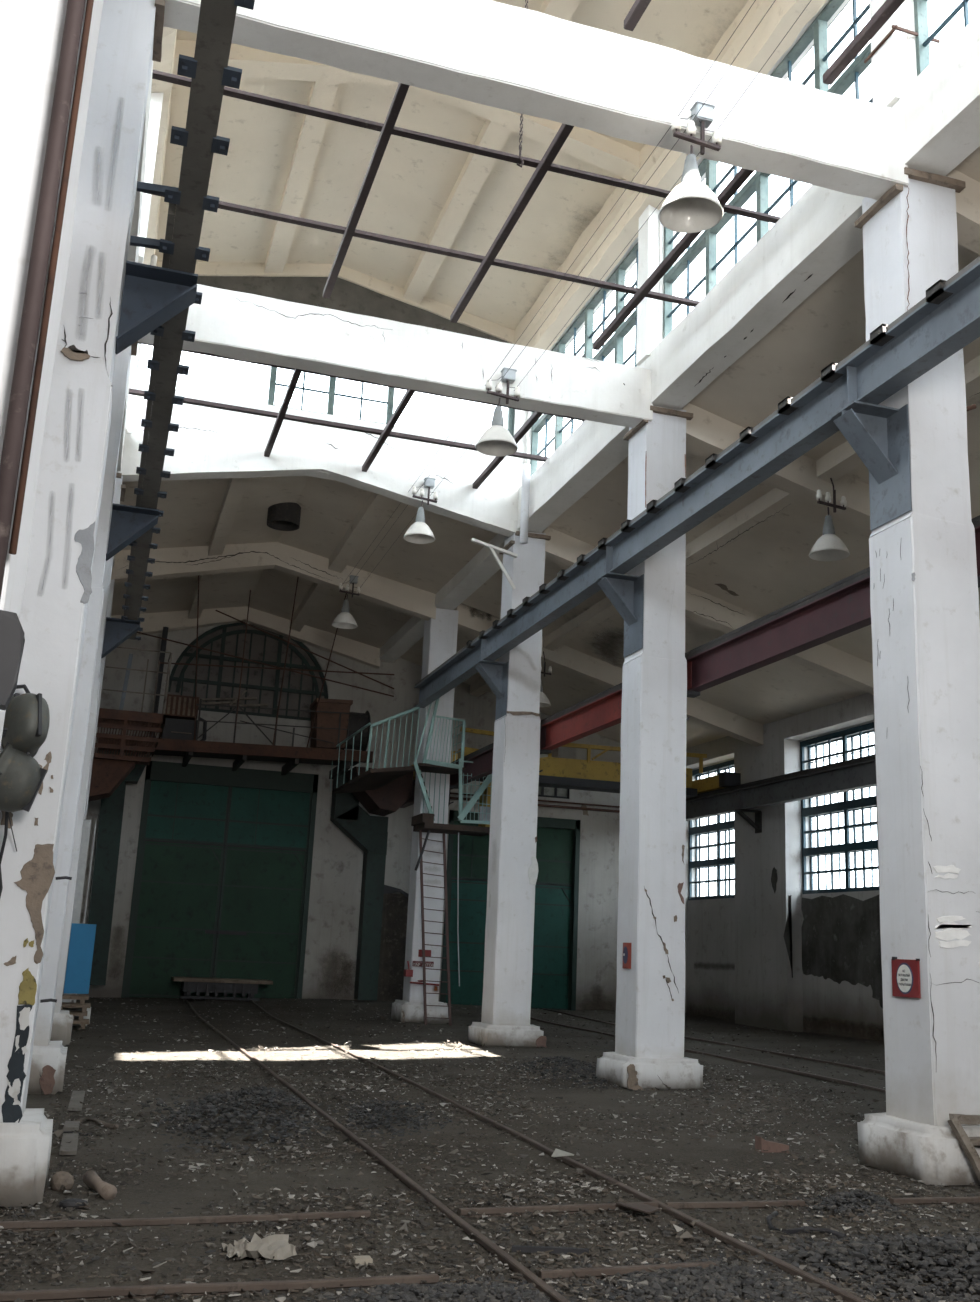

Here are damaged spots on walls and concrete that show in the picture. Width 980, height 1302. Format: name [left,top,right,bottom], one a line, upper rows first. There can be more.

flaking render [61,325,100,361]
peeling [74,522,95,604]
flaking render [14,844,55,964]
crack [644,887,679,1001]
peeling [935,916,973,948]